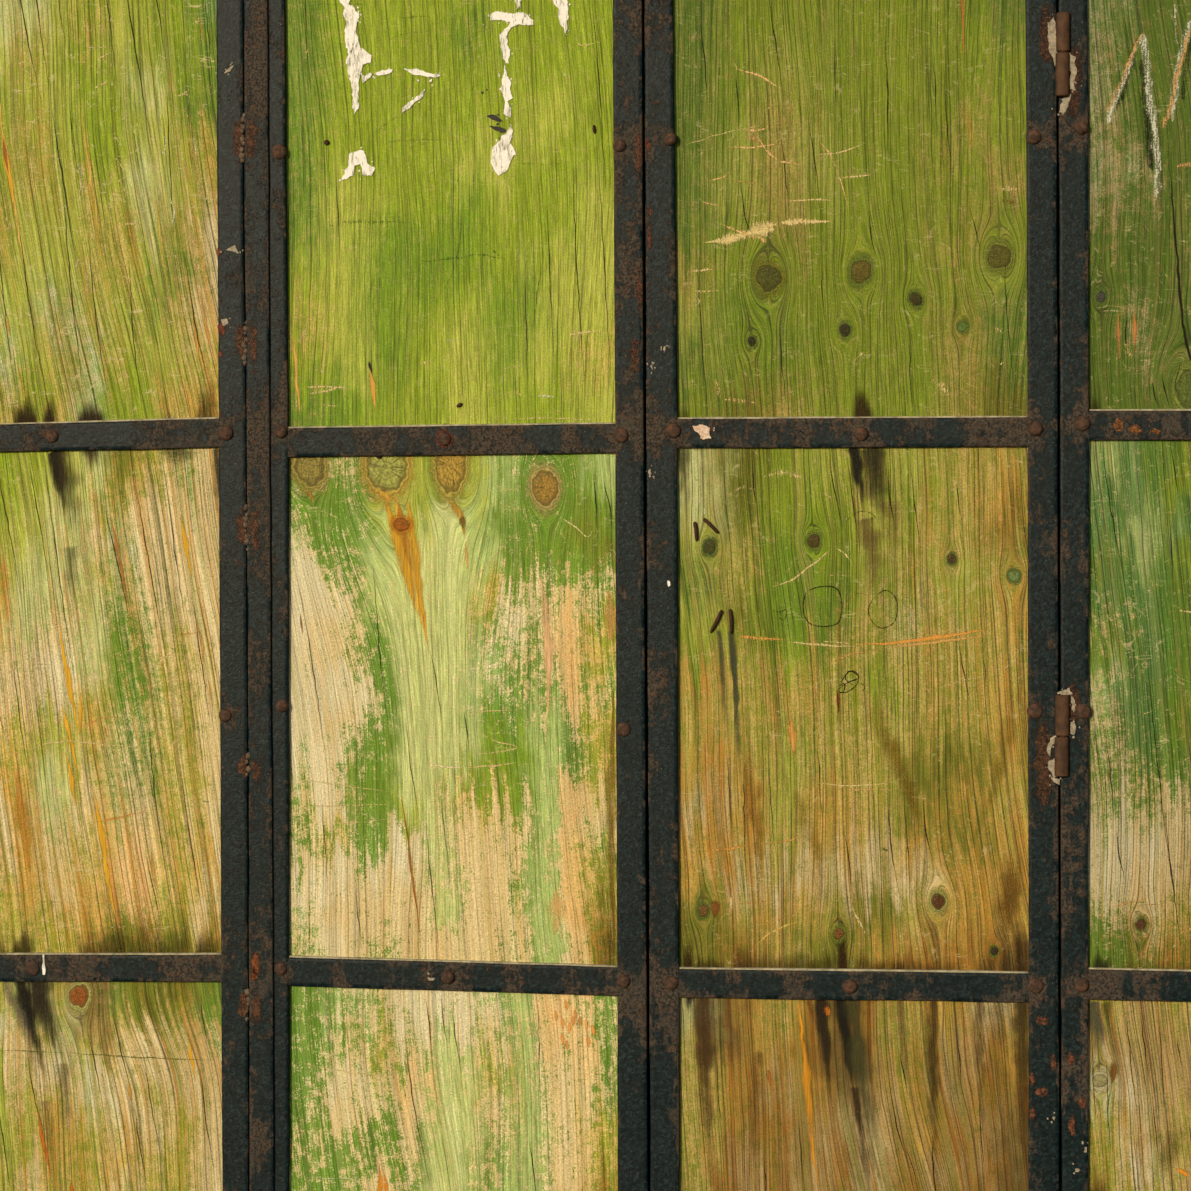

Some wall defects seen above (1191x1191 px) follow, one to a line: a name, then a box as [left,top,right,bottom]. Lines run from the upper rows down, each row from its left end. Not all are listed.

peeling [339,0,441,115]
peeling [475,0,533,176]
peeling [553,0,571,35]
rust [1039,4,1053,63]
rust [1068,45,1083,116]
peeling [339,147,375,181]
crack [1152,157,1191,407]
rust [1032,721,1053,809]
leakage [5,982,55,1062]
leakage [686,998,713,1119]
leakage [799,1000,869,1189]
leakage [1014,1003,1029,1115]